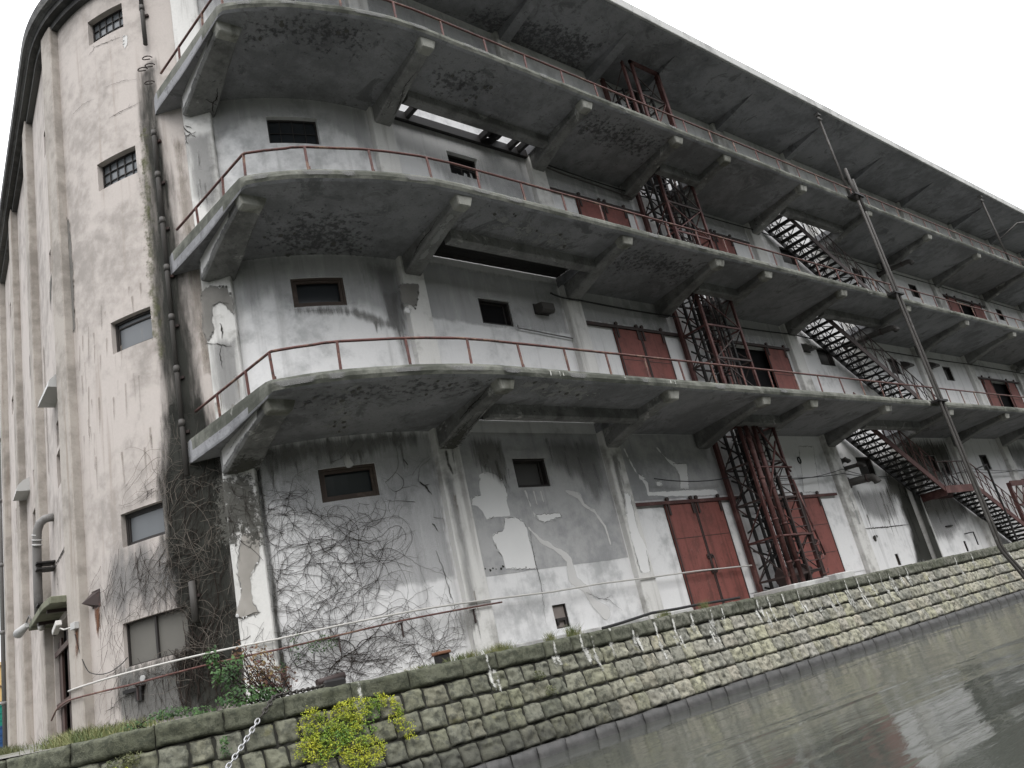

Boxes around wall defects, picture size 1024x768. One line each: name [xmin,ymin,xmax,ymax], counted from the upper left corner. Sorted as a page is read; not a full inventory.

water stain [353,8,385,17]
peeling [200,285,234,342]
crack [207,302,228,366]
water stain [113,68,416,711]
peeling [623,447,718,497]
peeling [470,472,562,572]
peeling [236,531,260,619]
water stain [781,570,911,626]
water stain [579,634,601,665]